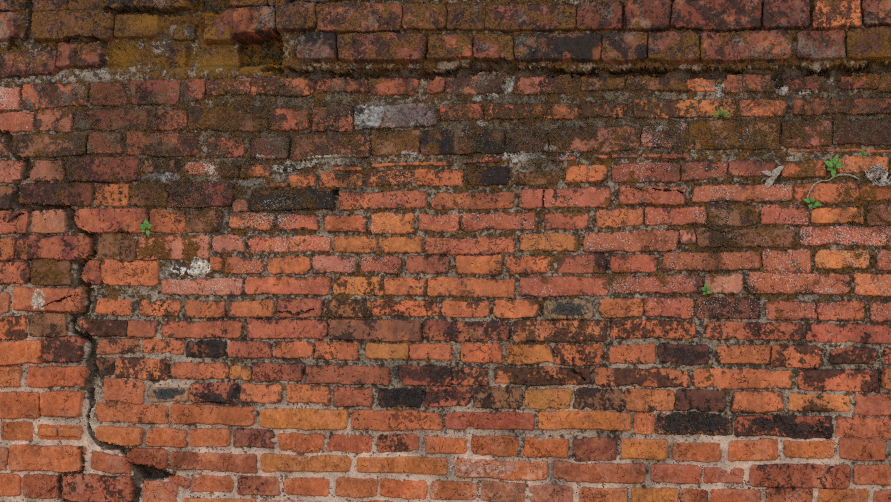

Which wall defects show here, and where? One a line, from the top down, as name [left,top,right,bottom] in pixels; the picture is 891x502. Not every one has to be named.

crack [7,0,33,50]
crack [0,130,153,502]